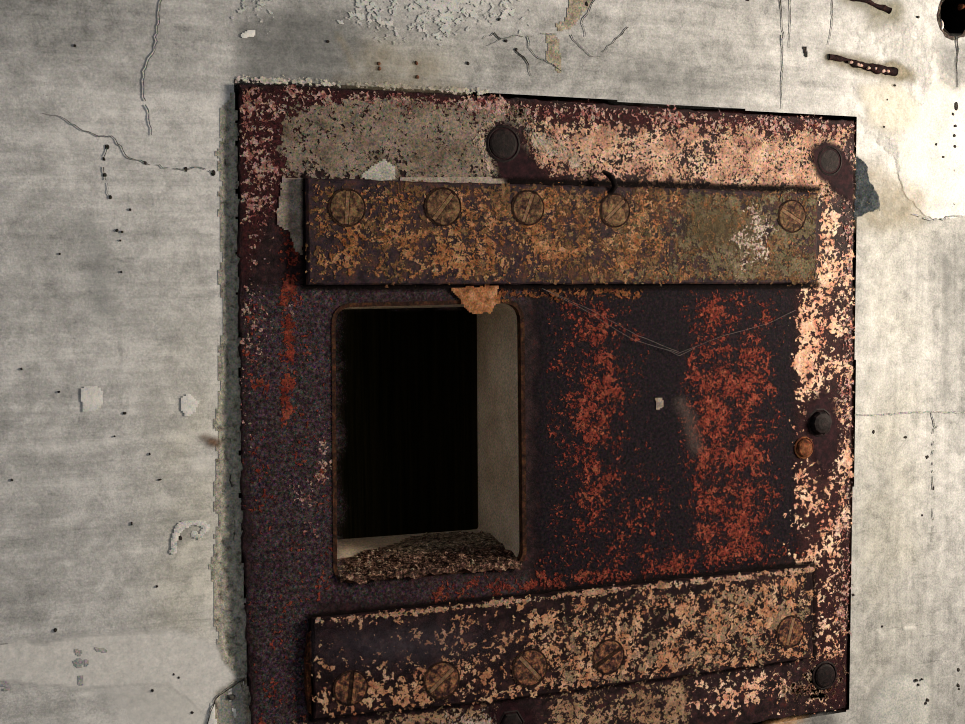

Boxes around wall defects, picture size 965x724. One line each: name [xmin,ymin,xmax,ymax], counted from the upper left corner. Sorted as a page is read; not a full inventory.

crack [142,0,162,135]
spalling [546,0,593,73]
rust [826,54,914,81]
rust [845,0,903,21]
crack [42,113,216,199]
rust [489,123,545,180]
rust [813,142,880,219]
peeling [861,16,965,221]
rust [241,189,823,724]
rust [805,394,840,476]
crack [207,679,245,724]